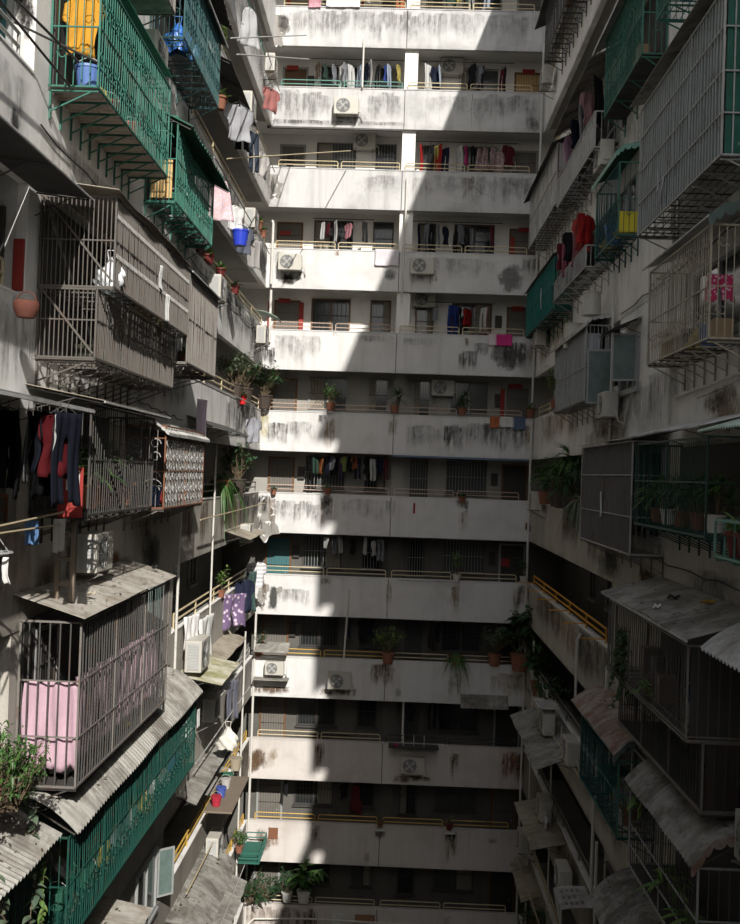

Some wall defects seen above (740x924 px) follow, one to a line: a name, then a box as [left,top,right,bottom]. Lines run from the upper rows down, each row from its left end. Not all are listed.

water stain [498,265,522,292]
water stain [459,343,526,370]
water stain [444,426,472,445]
water stain [222,493,332,522]
water stain [261,584,286,608]
corrosion [248,750,264,771]